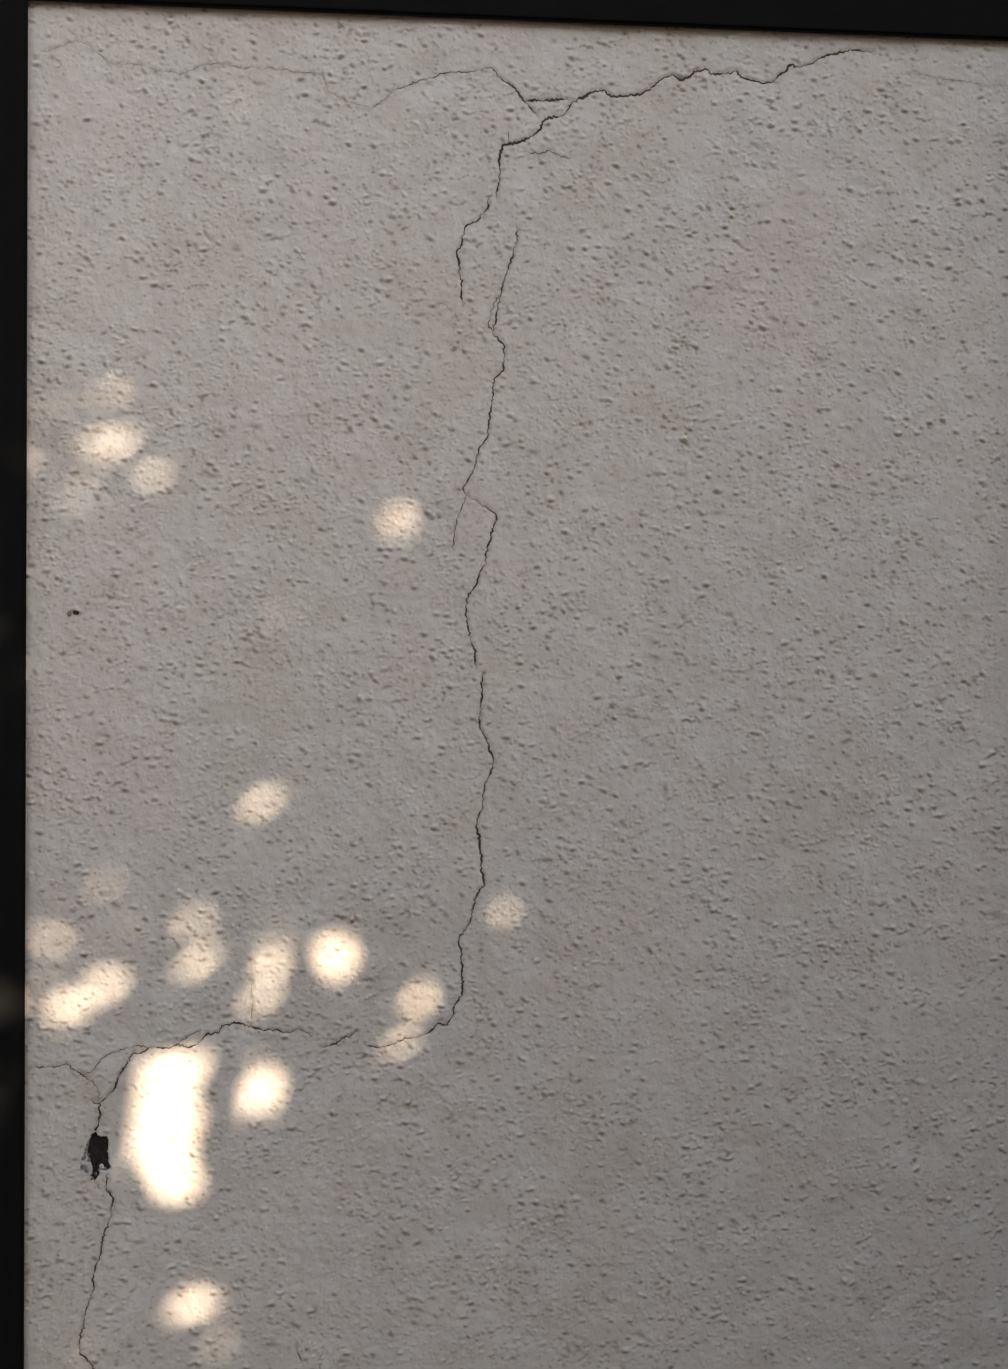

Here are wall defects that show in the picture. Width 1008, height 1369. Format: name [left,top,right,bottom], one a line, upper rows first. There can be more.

crack [31,40,873,1131]
hole [80,1132,110,1180]
crack [79,1174,115,1369]